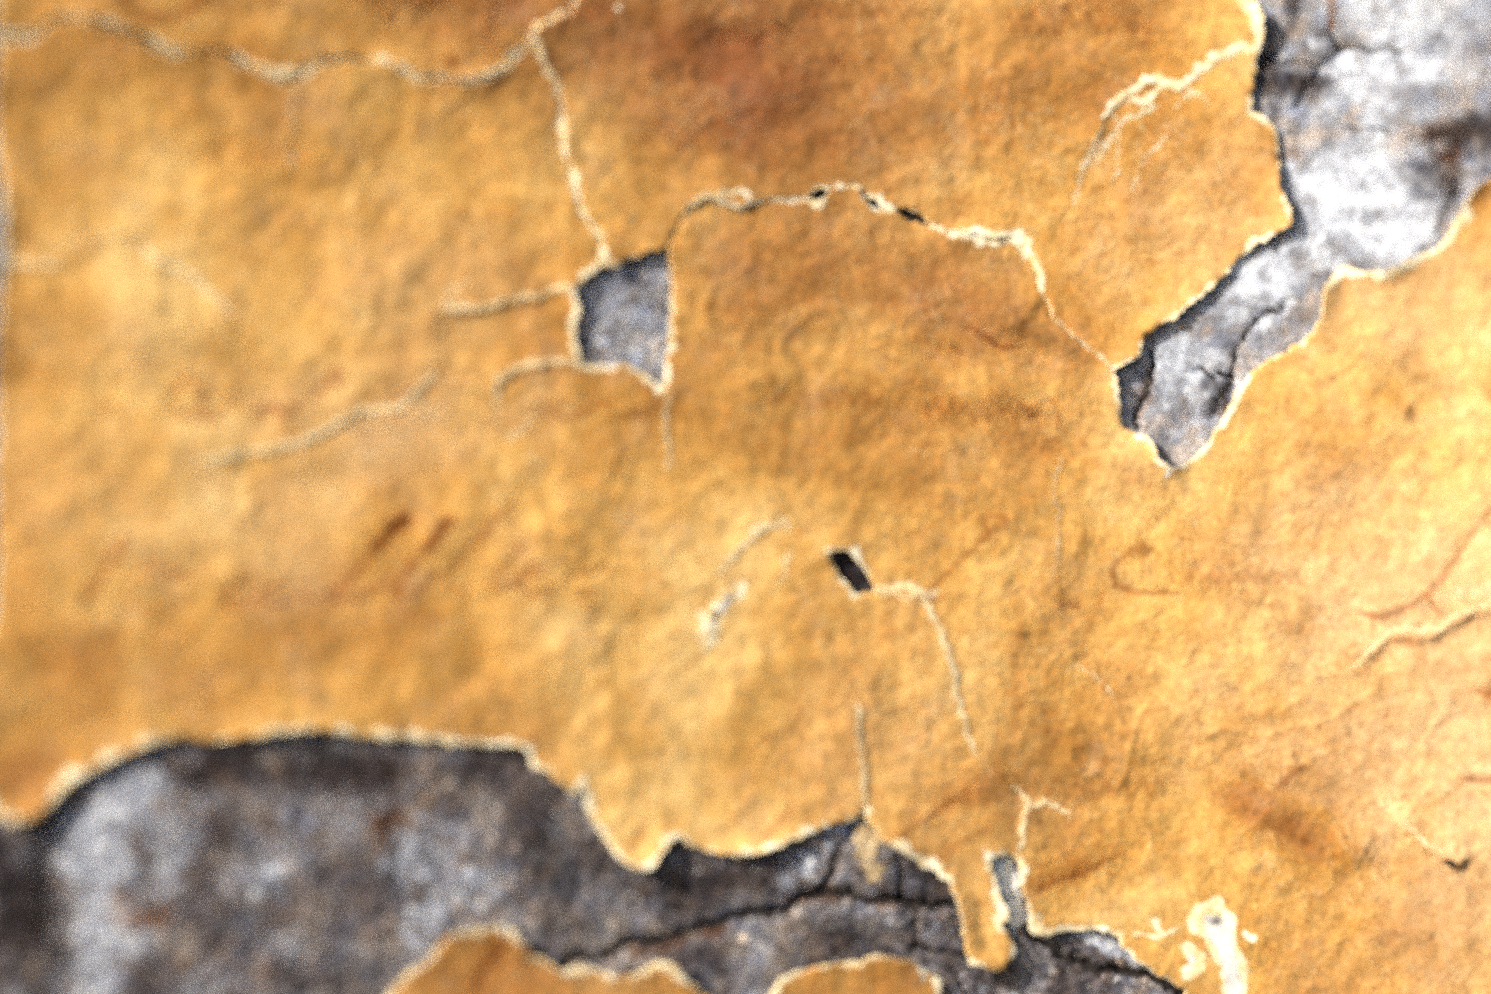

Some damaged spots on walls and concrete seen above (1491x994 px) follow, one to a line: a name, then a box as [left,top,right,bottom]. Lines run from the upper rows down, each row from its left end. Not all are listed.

crack [806,188,932,226]
peeling [1208,0,1491,331]
peeling [578,261,668,367]
crack [1132,350,1156,431]
peeling [1134,331,1225,418]
peeling [697,582,747,652]
peeling [47,762,246,994]
peeling [322,790,510,951]
peeling [778,841,834,890]
peeling [848,818,893,883]
peeling [992,855,1028,938]
peeling [1072,896,1257,994]